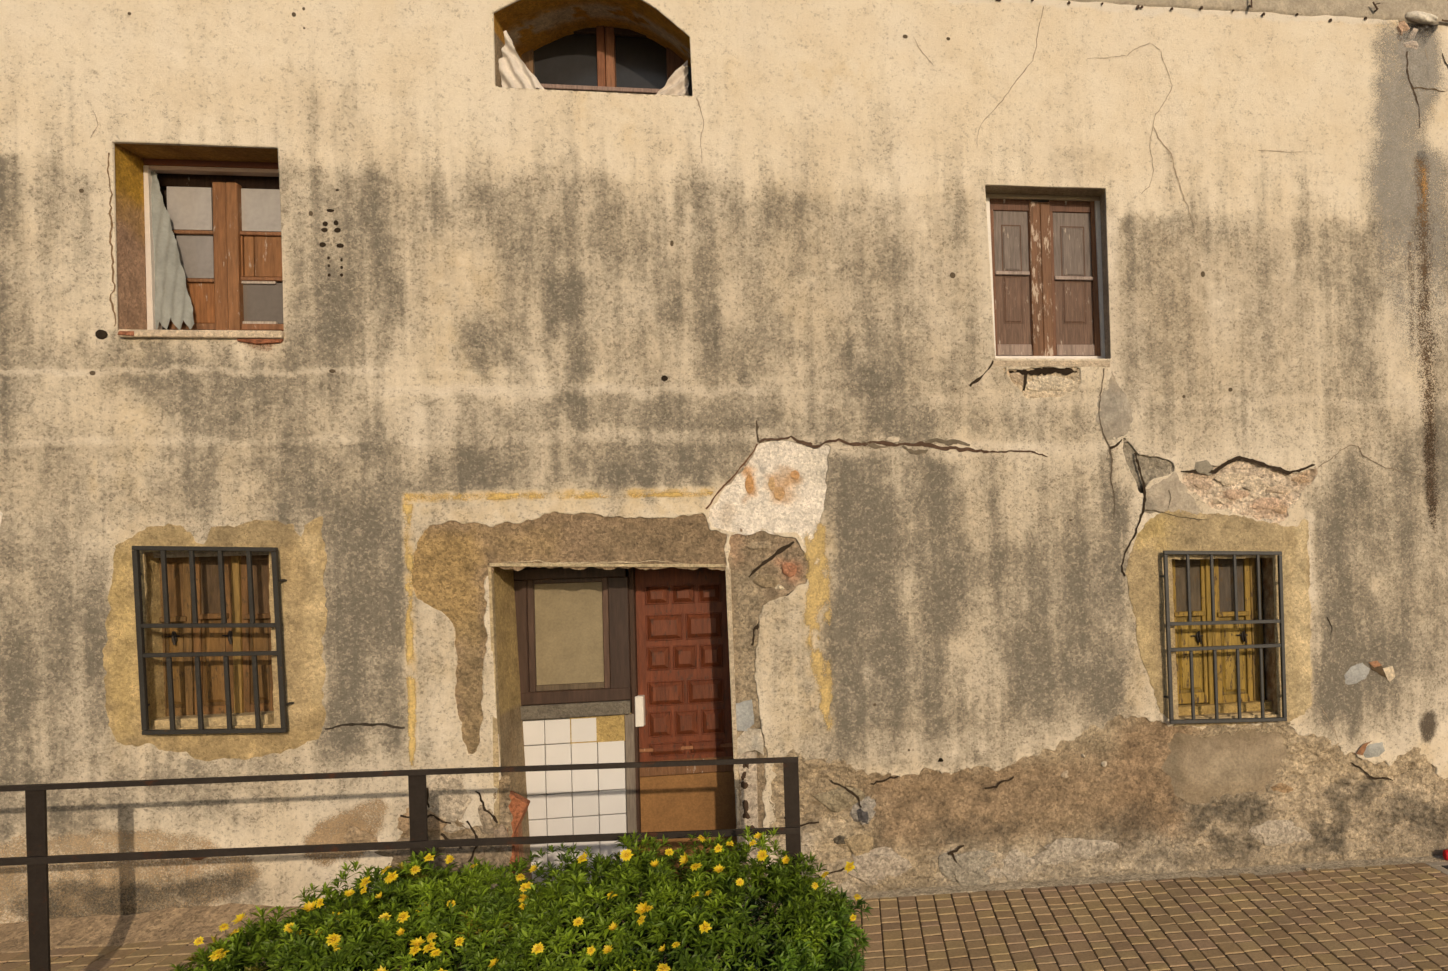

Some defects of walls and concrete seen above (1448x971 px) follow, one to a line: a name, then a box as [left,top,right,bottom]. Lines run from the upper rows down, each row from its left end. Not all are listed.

crack [977,6,1044,136]
crack [1087,43,1194,223]
damp [1368,28,1448,355]
crack [1406,19,1448,128]
spalling [1003,367,1081,399]
crack [705,420,1048,509]
crack [1098,368,1208,576]
spalling [403,438,1448,893]
flaking render [304,793,410,875]